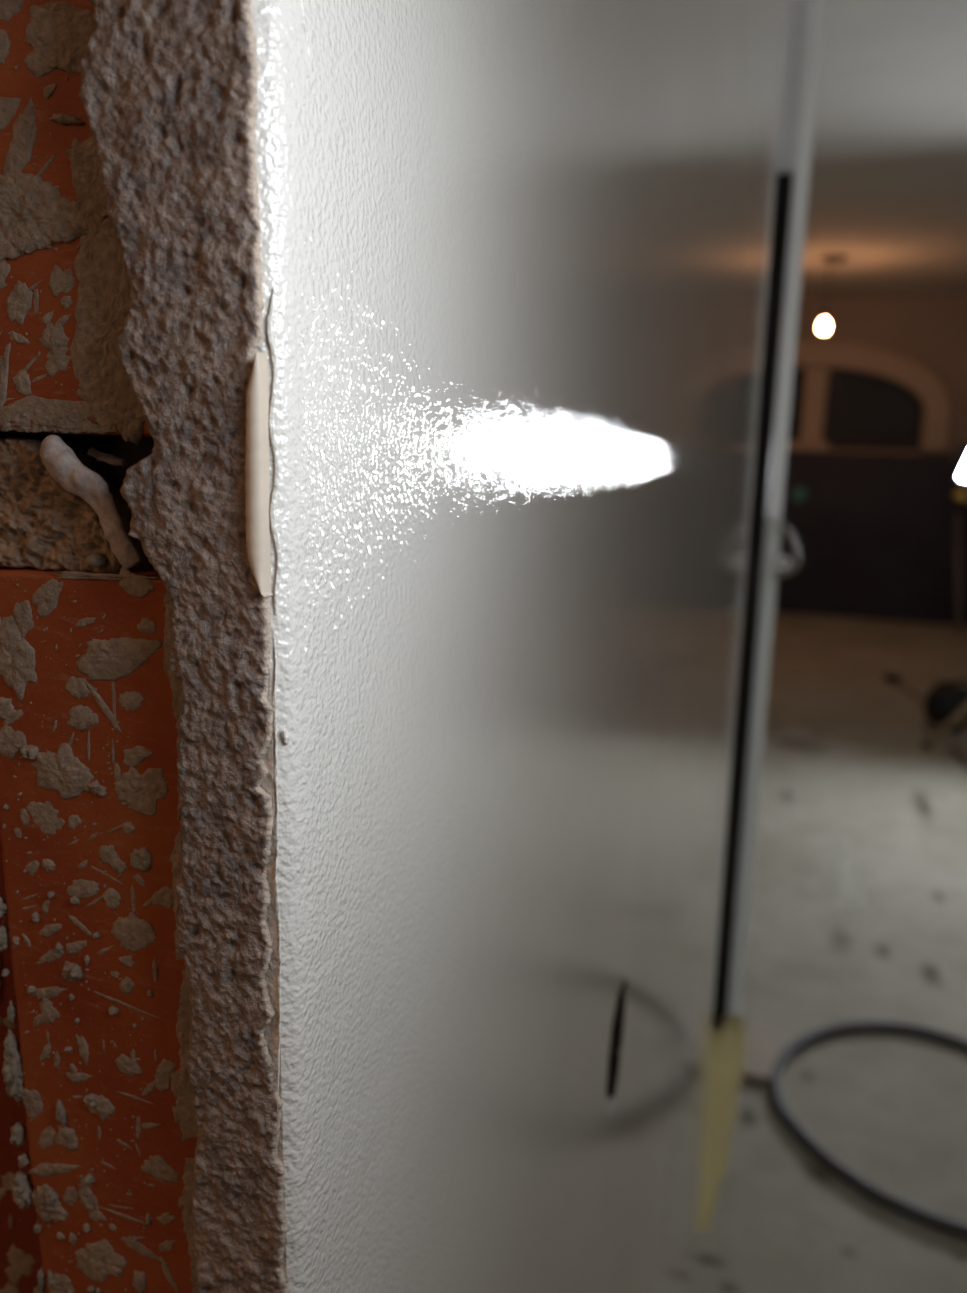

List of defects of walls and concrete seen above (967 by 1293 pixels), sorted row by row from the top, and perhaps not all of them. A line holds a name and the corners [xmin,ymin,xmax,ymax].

flaking render [79,0,290,1293]